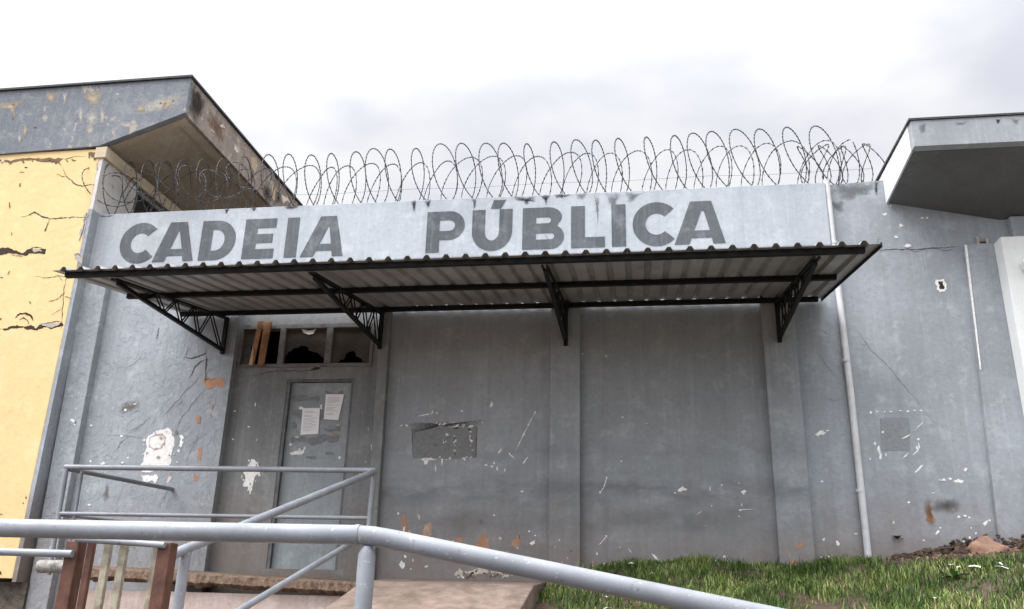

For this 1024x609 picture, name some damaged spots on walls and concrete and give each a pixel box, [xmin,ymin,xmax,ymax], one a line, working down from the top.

crack [876,241,960,252]
crack [0,211,83,331]
hole [935,279,947,292]
flaking render [203,377,225,388]
crack [108,347,207,460]
peeling [141,428,184,483]
peeling [411,422,506,472]
peeling [241,459,261,495]
flaking render [397,512,433,537]
flaking render [452,514,536,553]